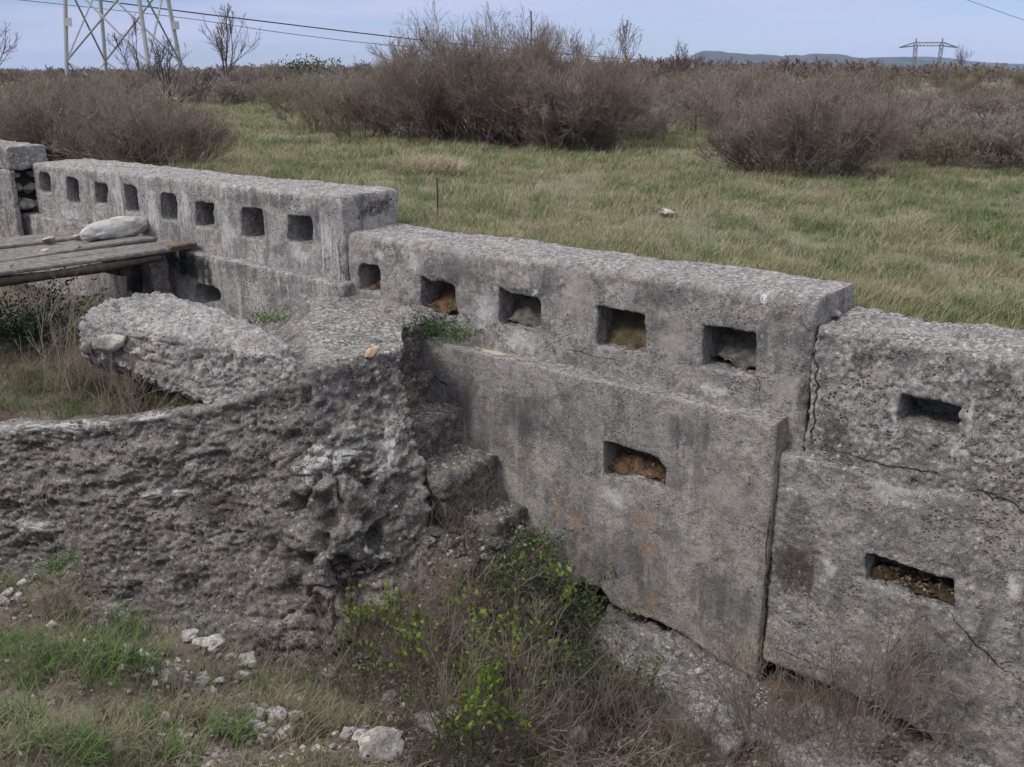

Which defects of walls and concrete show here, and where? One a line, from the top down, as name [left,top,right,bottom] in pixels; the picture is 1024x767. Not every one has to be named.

crack [810,326,942,476]
peeling [376,415,404,481]
crack [967,488,1024,516]
crack [719,517,843,677]
crack [947,609,1023,682]